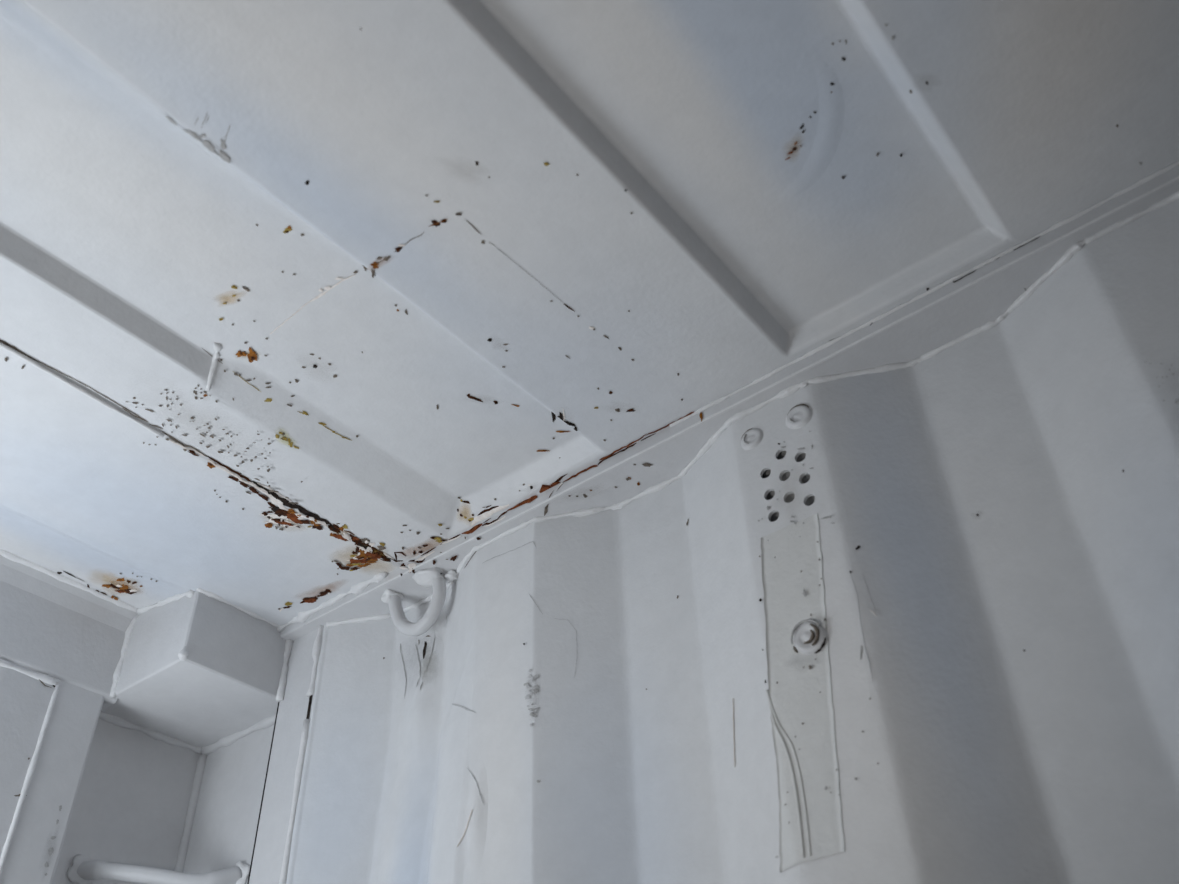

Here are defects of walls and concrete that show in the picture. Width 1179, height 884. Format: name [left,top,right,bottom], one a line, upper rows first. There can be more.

corrosion [102,573,157,600]
corrosion [278,589,331,612]